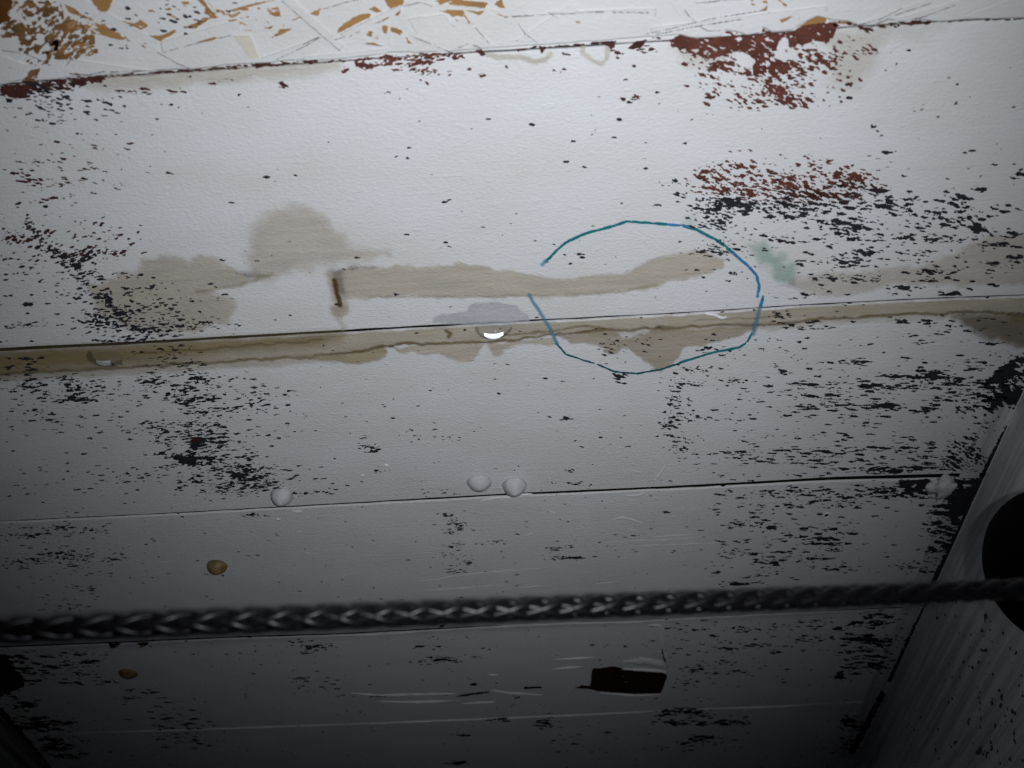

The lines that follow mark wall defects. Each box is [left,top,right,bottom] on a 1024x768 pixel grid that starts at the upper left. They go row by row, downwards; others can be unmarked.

peeling [0,0,486,127]
peeling [436,0,508,24]
water stain [0,127,1024,587]
water stain [0,508,130,613]
water stain [933,607,1024,766]